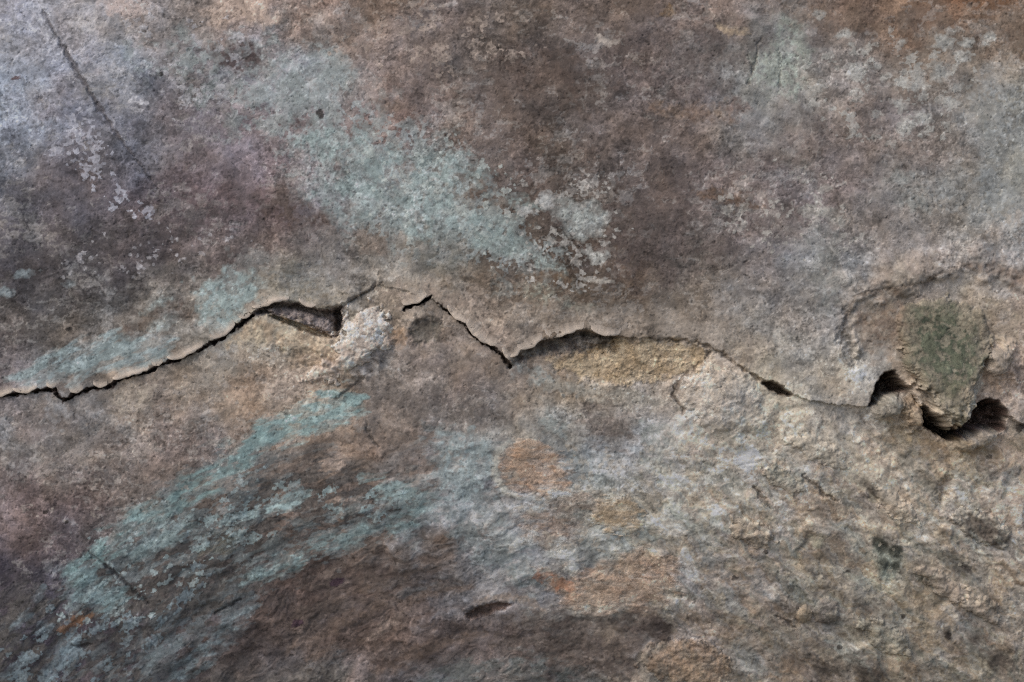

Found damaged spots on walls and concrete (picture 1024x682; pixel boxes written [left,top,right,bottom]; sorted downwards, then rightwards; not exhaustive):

crack [0,281,621,404]
crack [666,337,765,419]
crack [838,264,971,351]
crack [364,417,380,448]